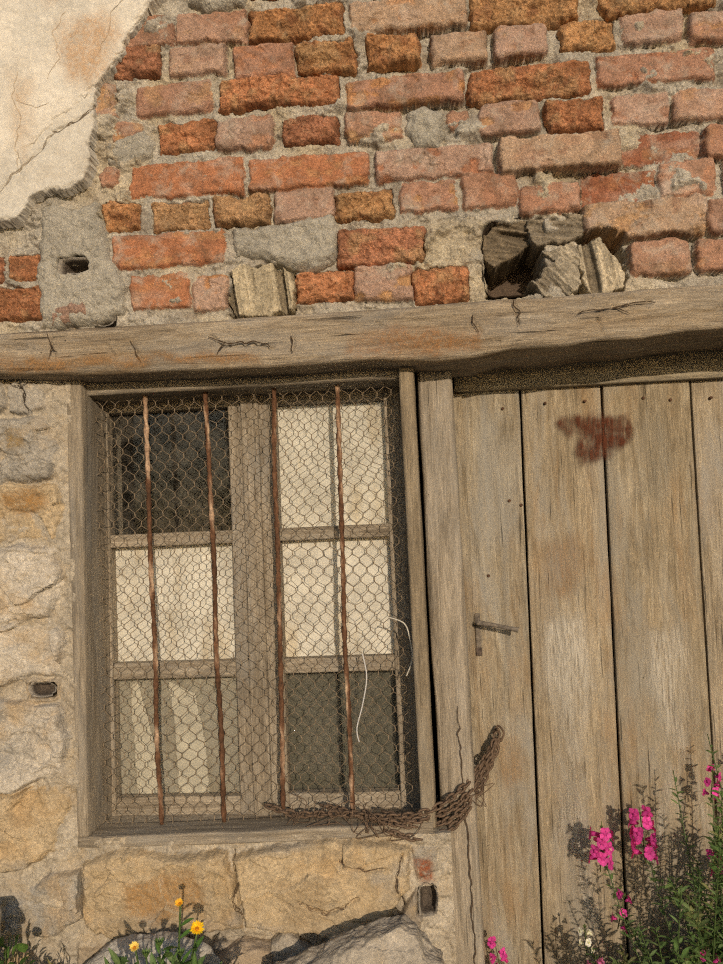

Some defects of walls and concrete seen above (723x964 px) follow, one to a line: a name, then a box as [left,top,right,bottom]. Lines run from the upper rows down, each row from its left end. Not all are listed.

crack [3,72,96,188]
peeling [0,0,170,229]
rust [558,415,632,462]